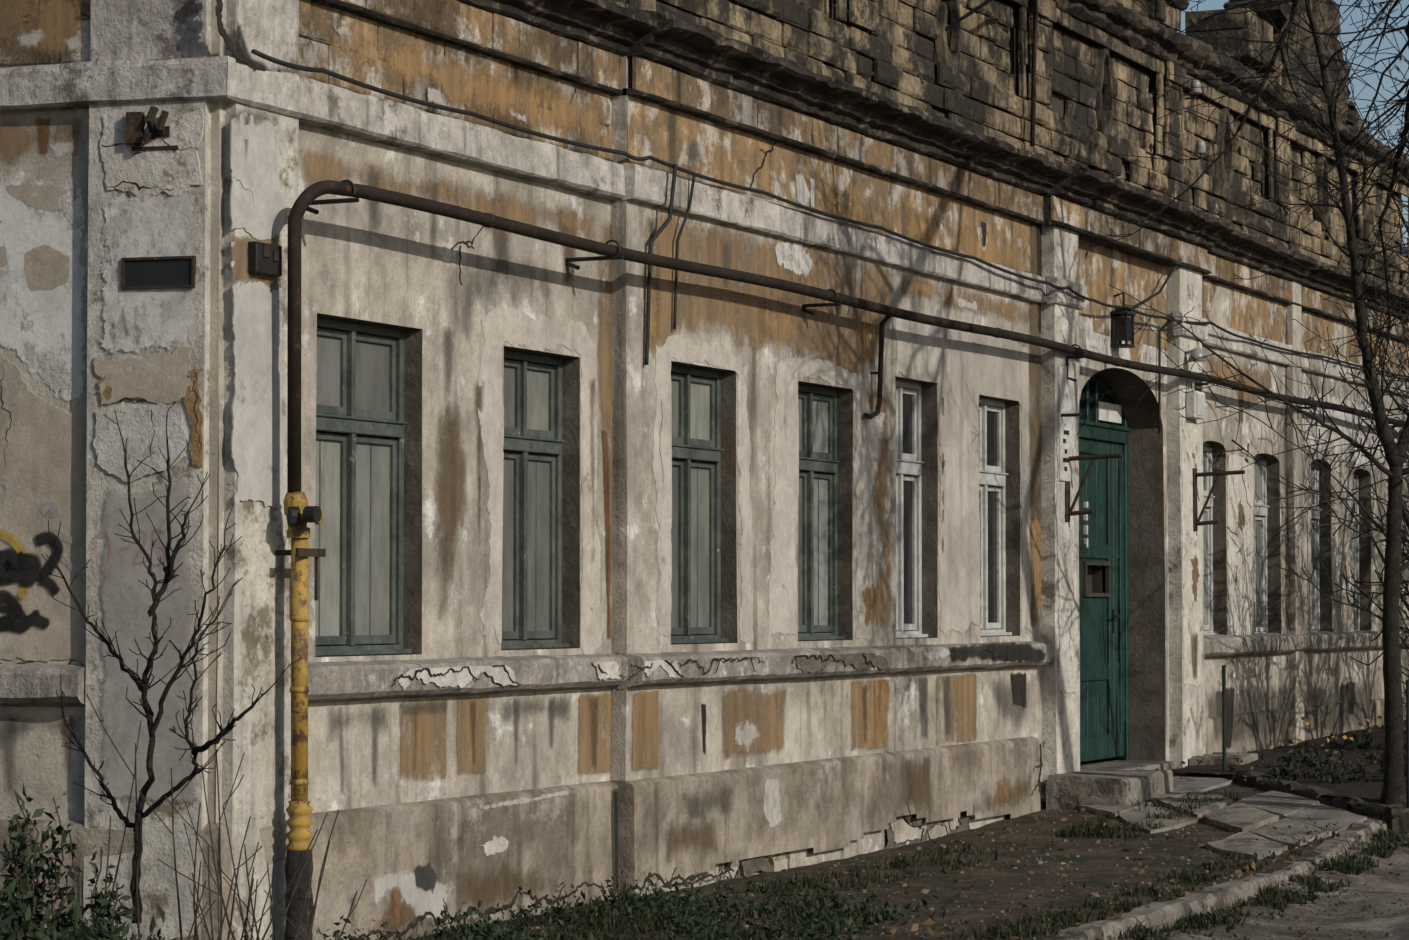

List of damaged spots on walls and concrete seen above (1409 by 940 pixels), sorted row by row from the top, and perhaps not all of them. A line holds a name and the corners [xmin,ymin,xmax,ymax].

peeling [0,0,89,54]
leakage [795,173,815,207]
peeling [826,192,1028,272]
leakage [1031,223,1042,276]
peeling [644,214,1030,374]
leakage [304,152,613,637]
peeling [0,109,204,801]
leakage [1011,302,1042,623]
peeling [723,688,786,758]
leakage [763,779,781,828]
leakage [902,760,929,806]
flaking render [479,836,509,856]